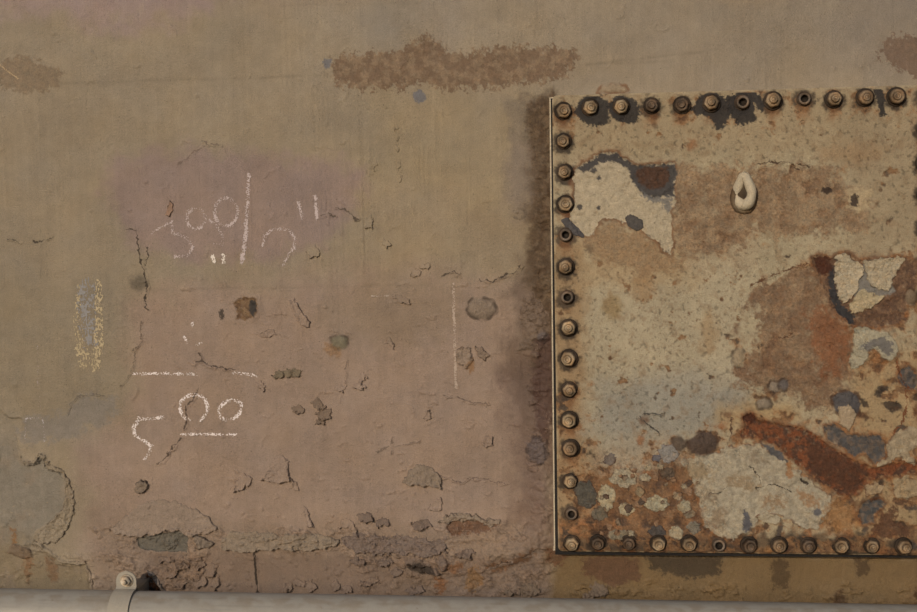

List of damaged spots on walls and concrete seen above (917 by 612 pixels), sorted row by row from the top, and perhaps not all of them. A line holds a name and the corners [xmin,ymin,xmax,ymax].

peeling [561,146,685,255]
crack [66,225,153,416]
peeling [214,290,277,338]
corrosion [556,131,917,552]
peeling [801,243,917,503]
peeling [0,407,93,590]
peeling [109,479,221,592]
peeling [232,455,299,493]
peeling [330,464,505,595]
corrosion [421,425,744,597]
peeling [689,414,824,538]